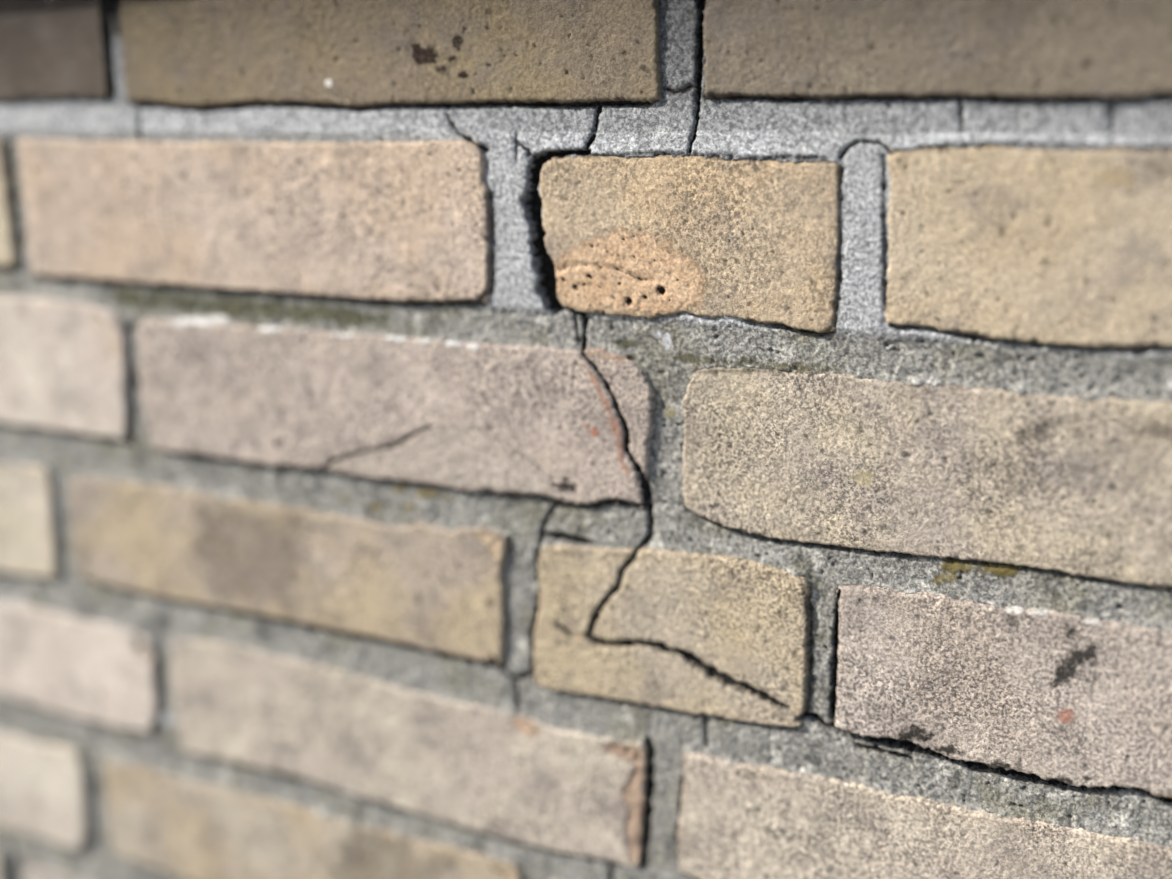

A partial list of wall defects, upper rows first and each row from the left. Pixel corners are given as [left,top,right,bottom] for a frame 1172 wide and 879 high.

crack [666,0,706,153]
crack [447,115,536,161]
crack [585,105,603,152]
crack [839,140,893,160]
crack [957,96,965,128]
crack [559,264,652,281]
spalling [554,227,706,314]
crack [324,427,432,469]
crack [480,308,1172,803]